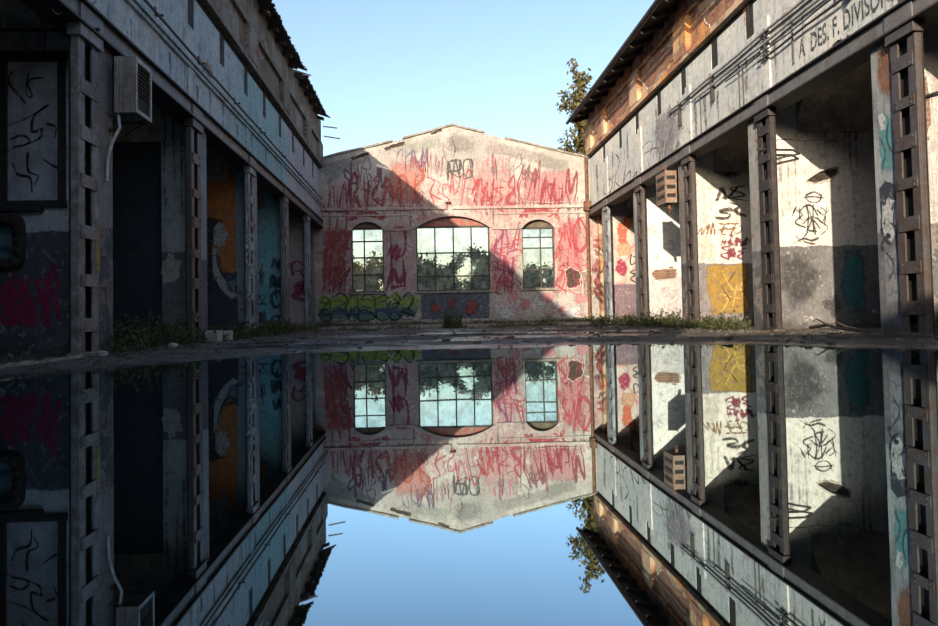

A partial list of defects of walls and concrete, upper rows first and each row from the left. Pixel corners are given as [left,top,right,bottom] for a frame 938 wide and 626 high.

spalling [805,165,840,185]
peeling [161,253,182,284]
peeling [562,263,595,303]